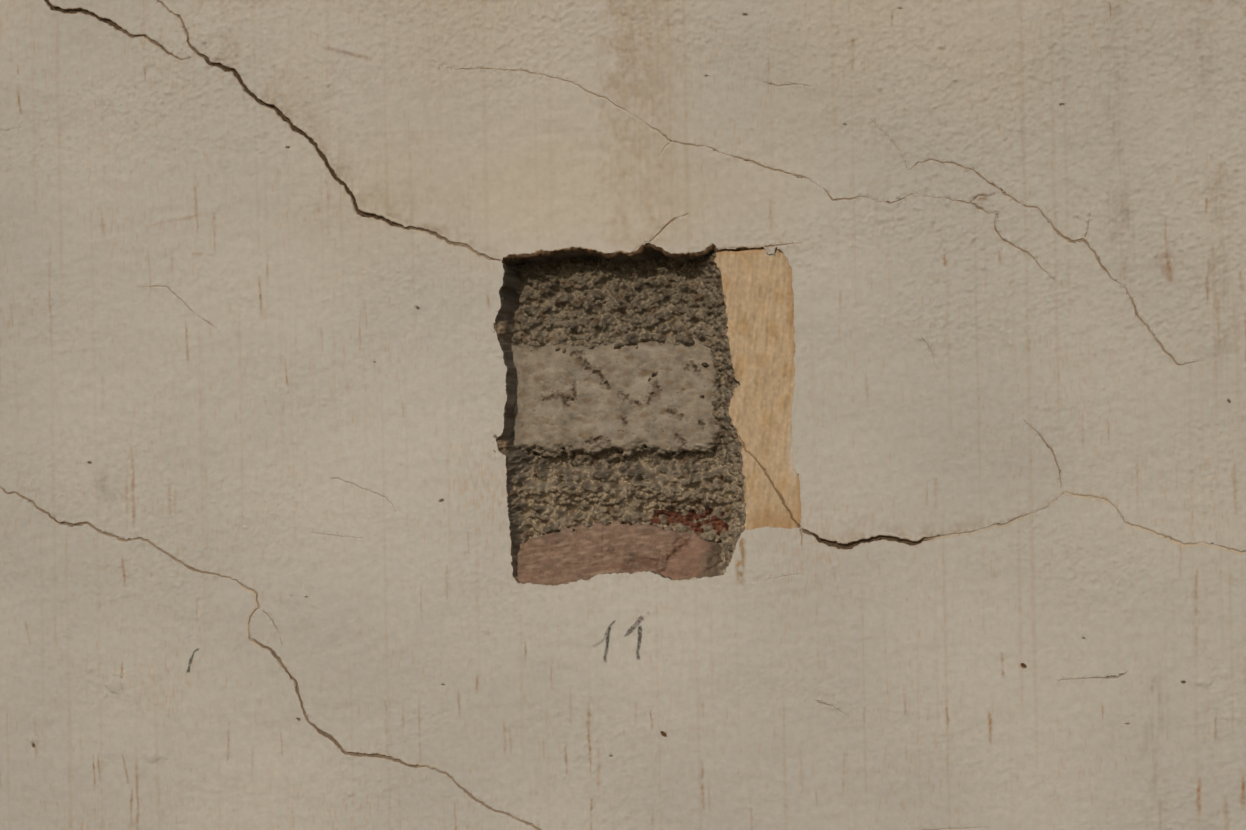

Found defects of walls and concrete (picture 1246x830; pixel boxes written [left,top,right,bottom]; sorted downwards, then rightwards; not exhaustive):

crack [41,0,502,265]
crack [429,58,1208,371]
crack [327,474,399,512]
spalling [492,242,802,587]
crack [737,415,1246,556]
crack [0,483,546,830]